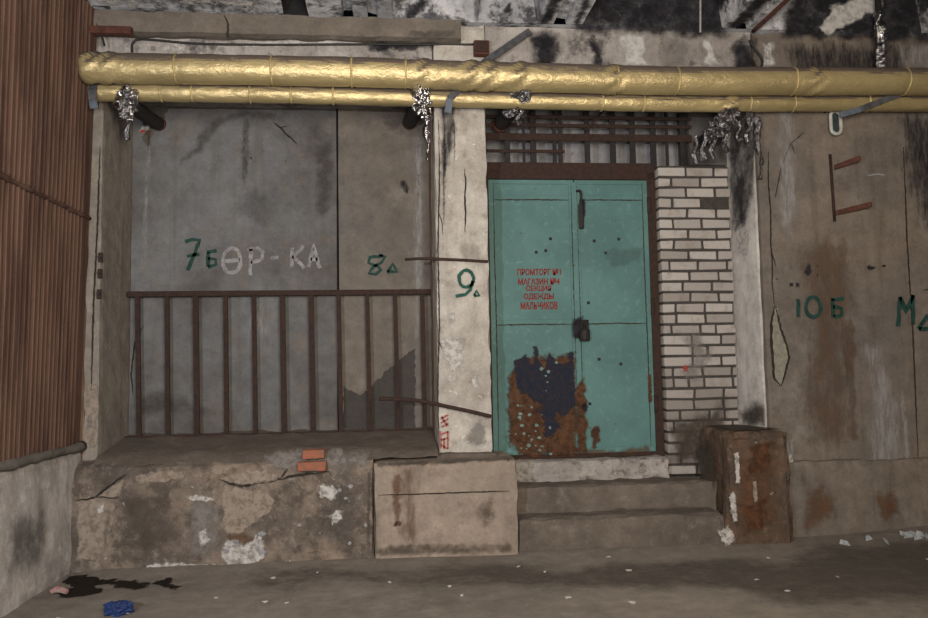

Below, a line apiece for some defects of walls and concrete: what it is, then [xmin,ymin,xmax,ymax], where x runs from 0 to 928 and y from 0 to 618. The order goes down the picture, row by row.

spalling [770,306,790,386]
peeling [514,346,576,455]
corrosion [506,355,606,459]
crack [219,469,330,489]
spalling [189,448,367,564]
corrosion [739,443,772,530]